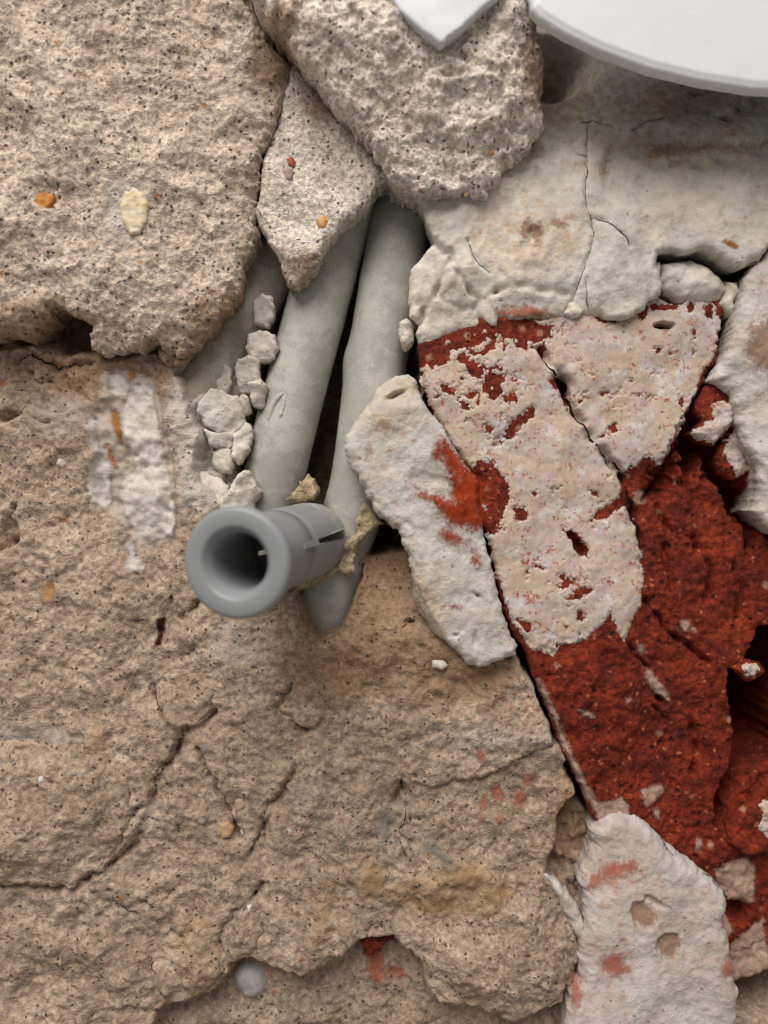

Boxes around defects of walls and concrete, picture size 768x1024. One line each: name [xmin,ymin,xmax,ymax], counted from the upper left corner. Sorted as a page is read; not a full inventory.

spalling [520,216,568,245]
crack [572,118,663,314]
peeling [419,298,721,656]
crack [539,352,643,556]
peeling [646,670,670,701]
peeling [536,678,595,799]
crack [75,687,211,912]
peeling [640,785,664,821]
peeling [714,858,756,903]
spalling [632,902,653,928]
spalling [658,933,680,959]
peeling [721,914,768,981]